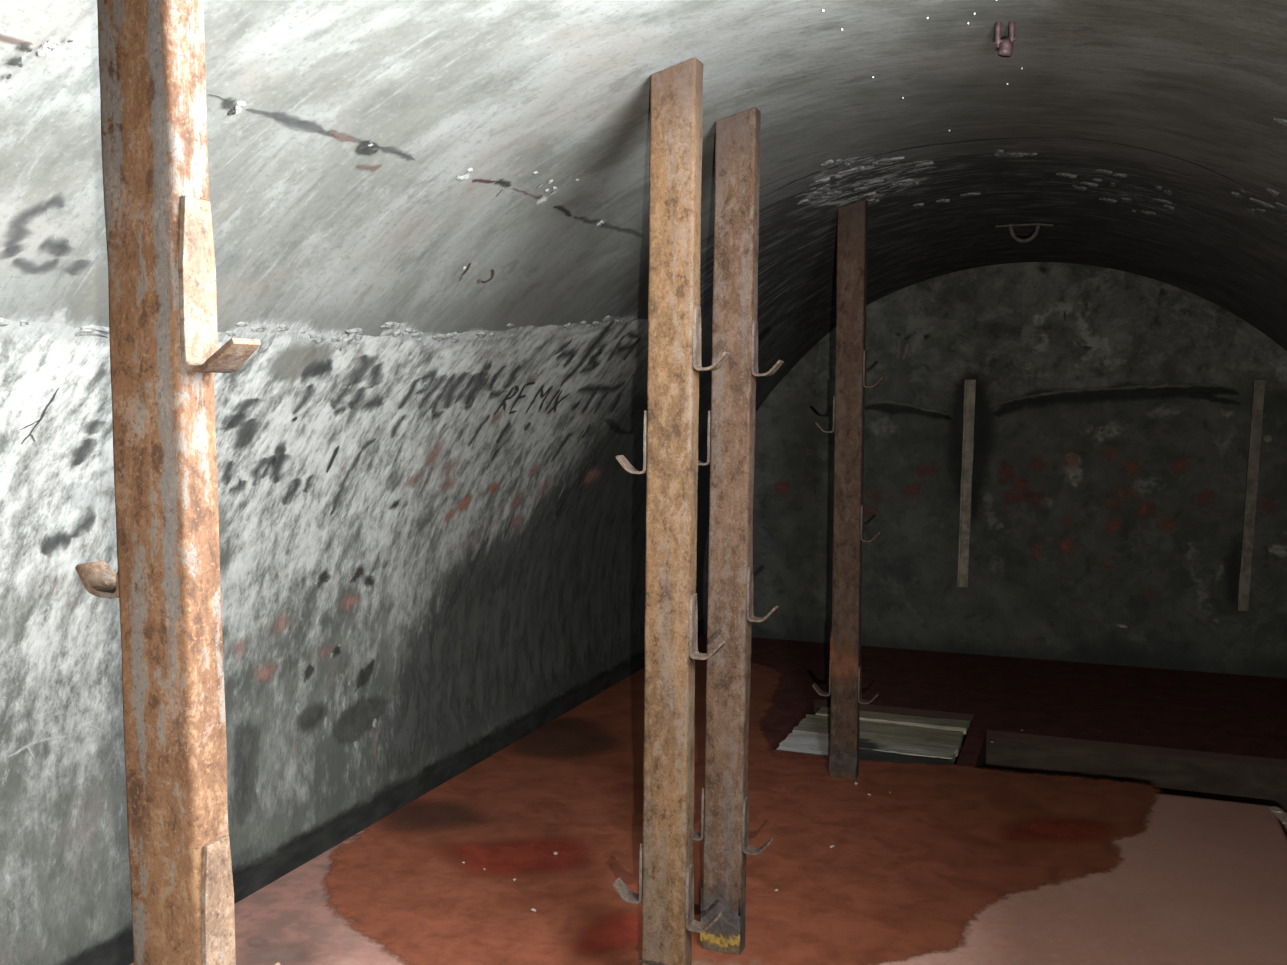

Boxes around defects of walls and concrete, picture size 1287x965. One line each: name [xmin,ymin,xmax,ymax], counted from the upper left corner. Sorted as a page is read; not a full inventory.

crack [209,94,415,160]
crack [472,179,643,237]
peeling [795,155,936,208]
peeling [913,193,981,207]
crack [990,384,1240,416]
water stain [322,392,647,965]
corrosion [830,635,858,682]
water stain [692,652,1160,965]